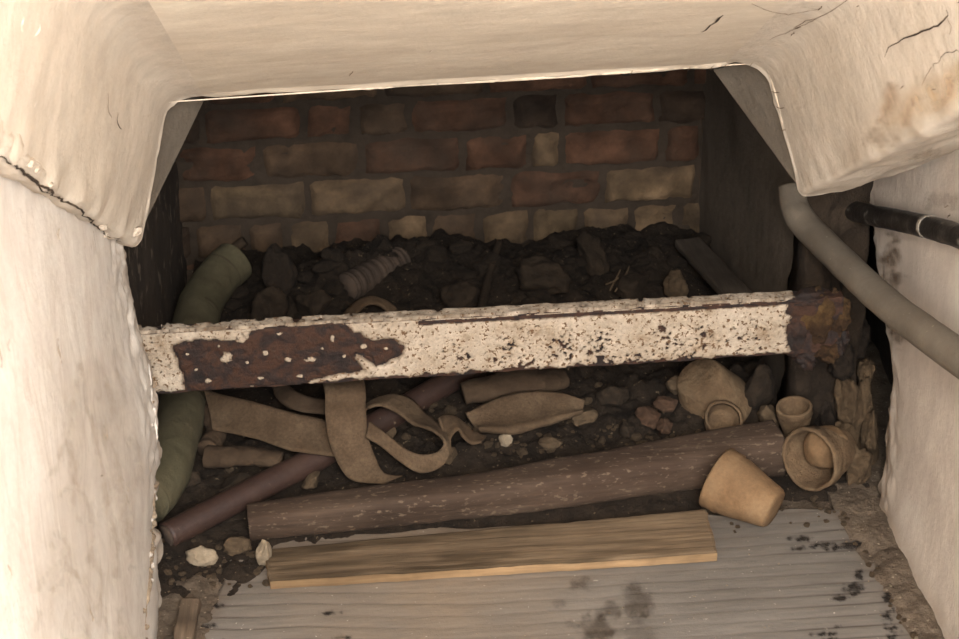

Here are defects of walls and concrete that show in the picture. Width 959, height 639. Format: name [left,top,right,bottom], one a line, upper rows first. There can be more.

crack [885,2,959,82]
corrosion [173,324,401,391]